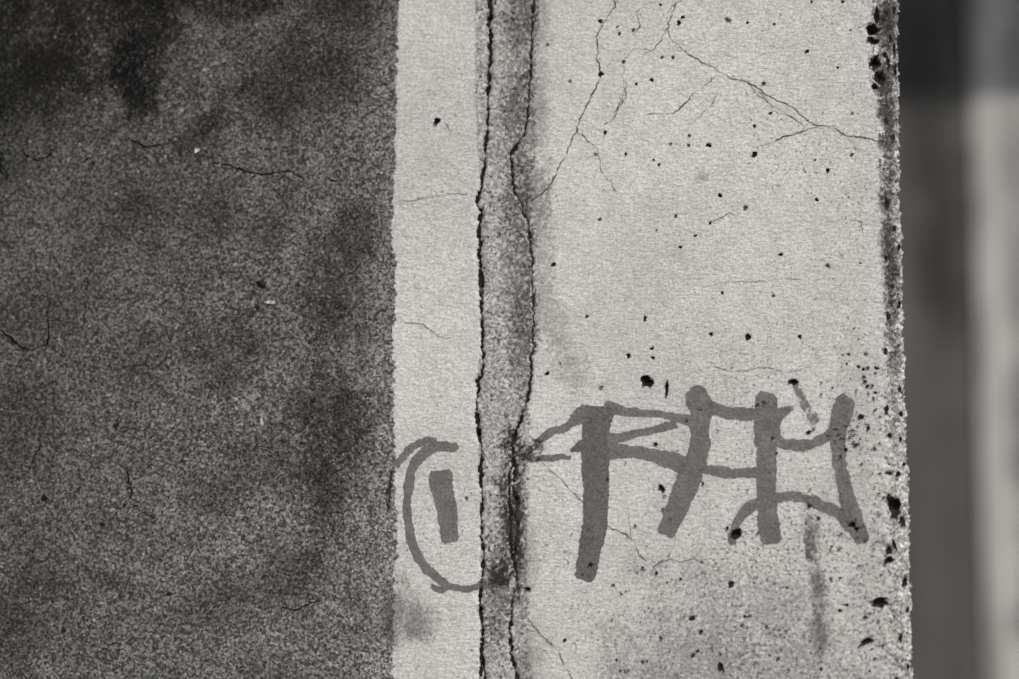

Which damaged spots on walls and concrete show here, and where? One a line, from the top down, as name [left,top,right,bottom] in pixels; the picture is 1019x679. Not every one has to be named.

leakage [0,0,284,181]
crack [399,0,878,679]